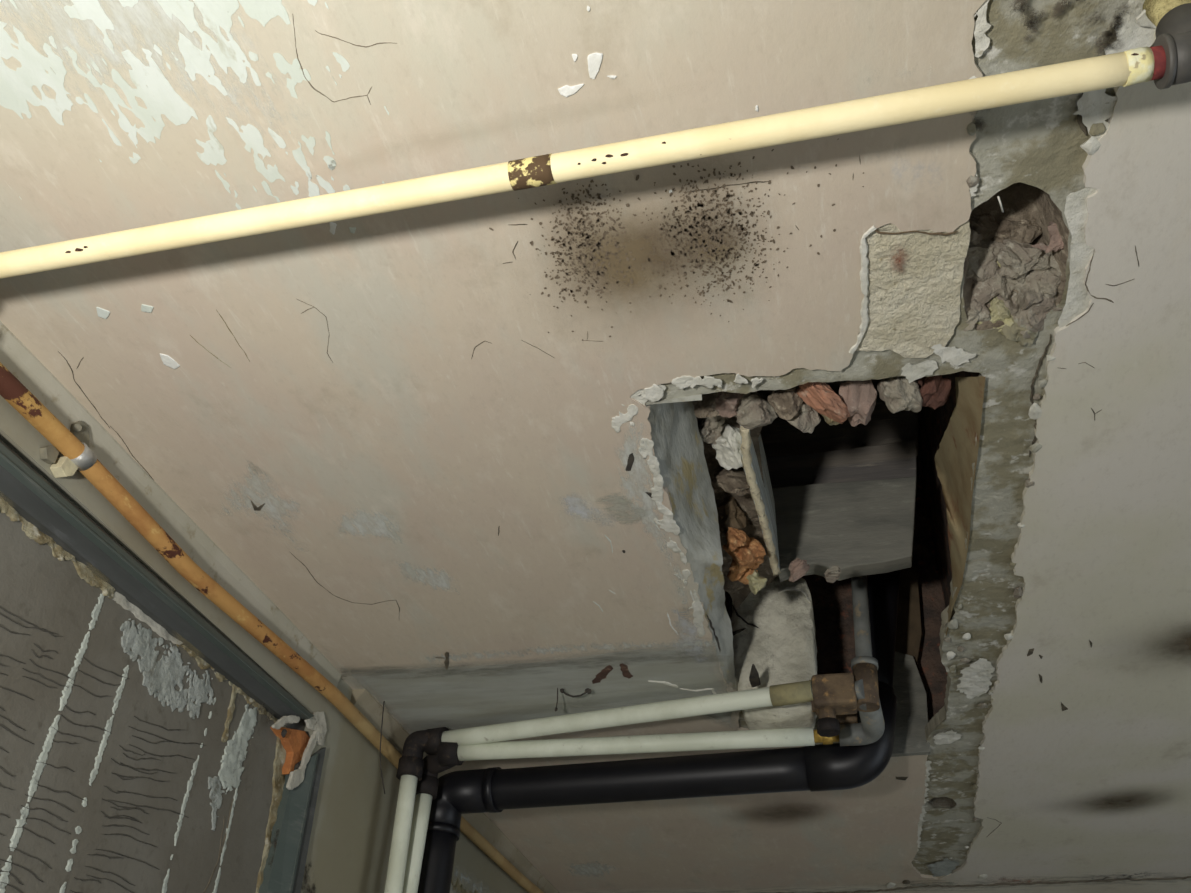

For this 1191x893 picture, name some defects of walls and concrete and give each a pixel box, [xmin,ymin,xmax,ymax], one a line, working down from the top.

peeling [0,0,350,210]
crack [293,19,384,105]
spalling [969,0,1156,79]
damp [530,156,795,322]
spalling [611,87,1117,877]